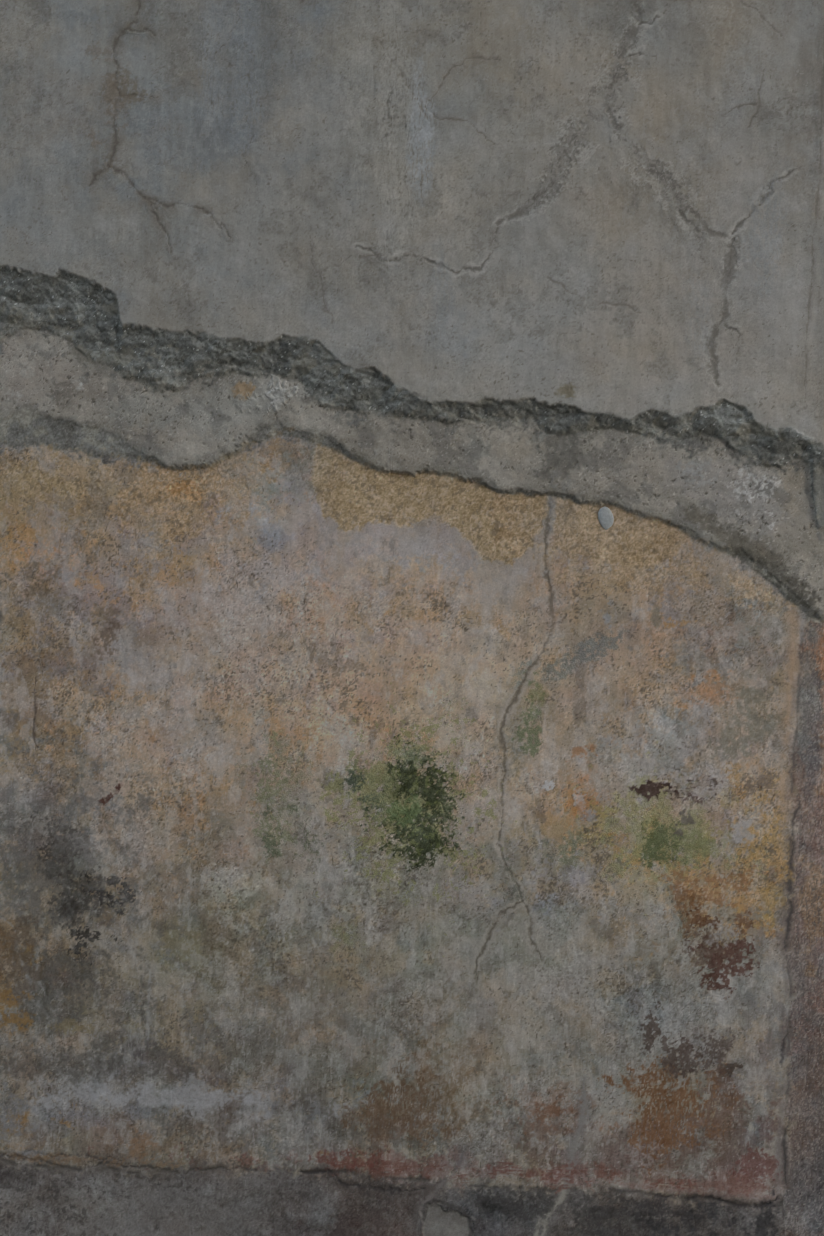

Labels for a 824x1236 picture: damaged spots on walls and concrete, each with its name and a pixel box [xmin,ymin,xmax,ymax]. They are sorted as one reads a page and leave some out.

crack [77,0,238,267]
crack [338,0,814,402]
flaking render [0,267,824,529]
spalling [0,411,824,622]
crack [465,487,580,996]